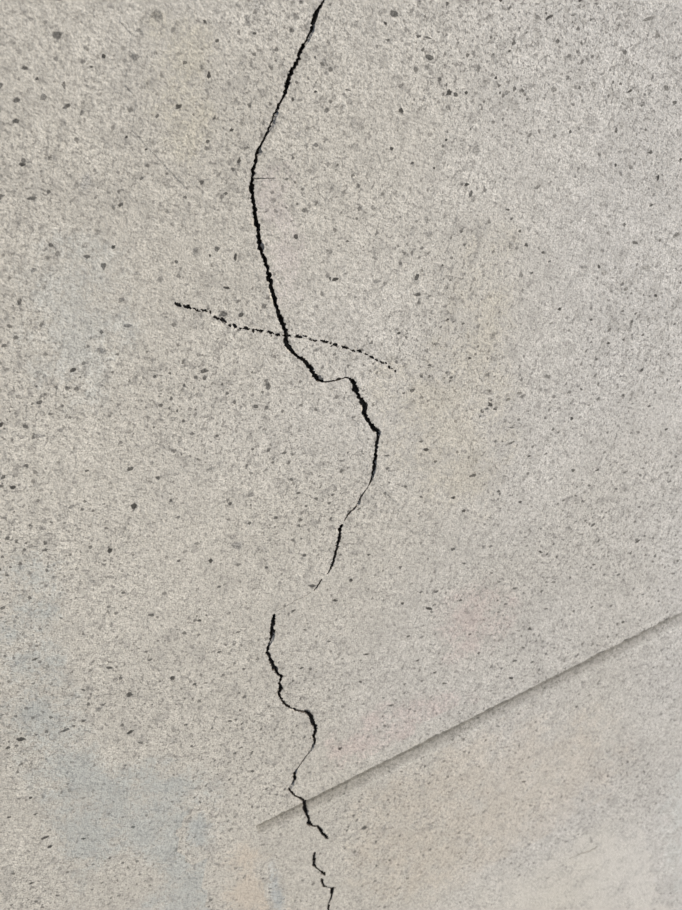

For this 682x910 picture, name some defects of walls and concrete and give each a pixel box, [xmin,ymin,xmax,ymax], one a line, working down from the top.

crack [174,0,396,910]